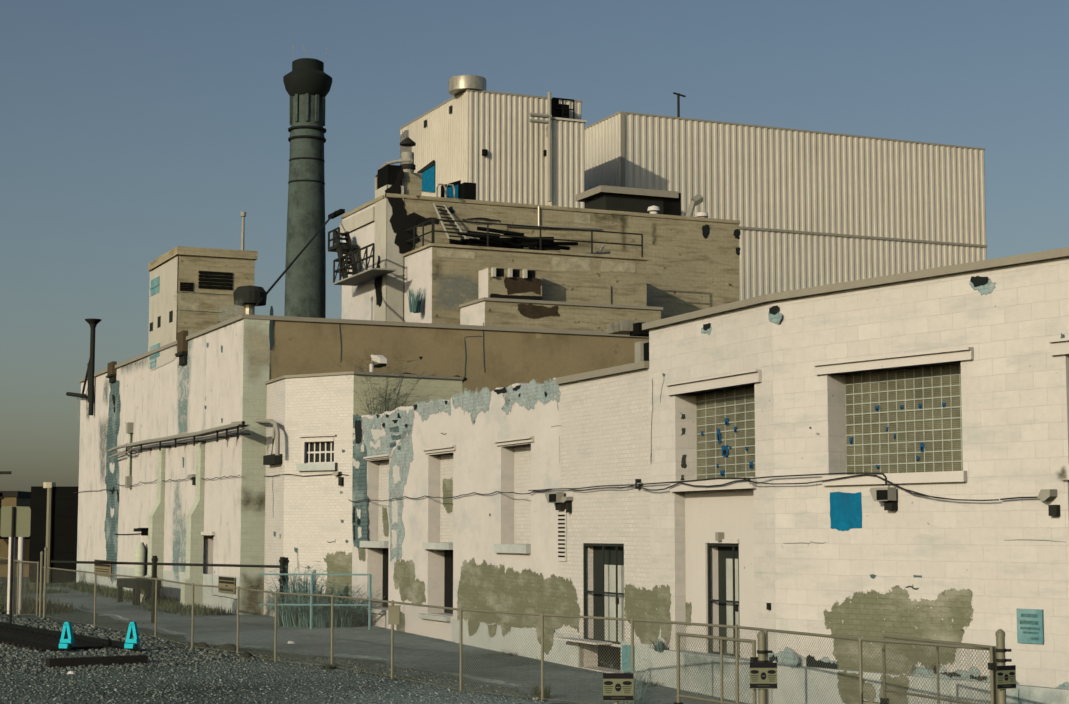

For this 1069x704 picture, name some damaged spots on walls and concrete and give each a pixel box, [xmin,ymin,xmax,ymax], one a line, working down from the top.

spalling [340,379,560,561]
spalling [911,664,990,682]